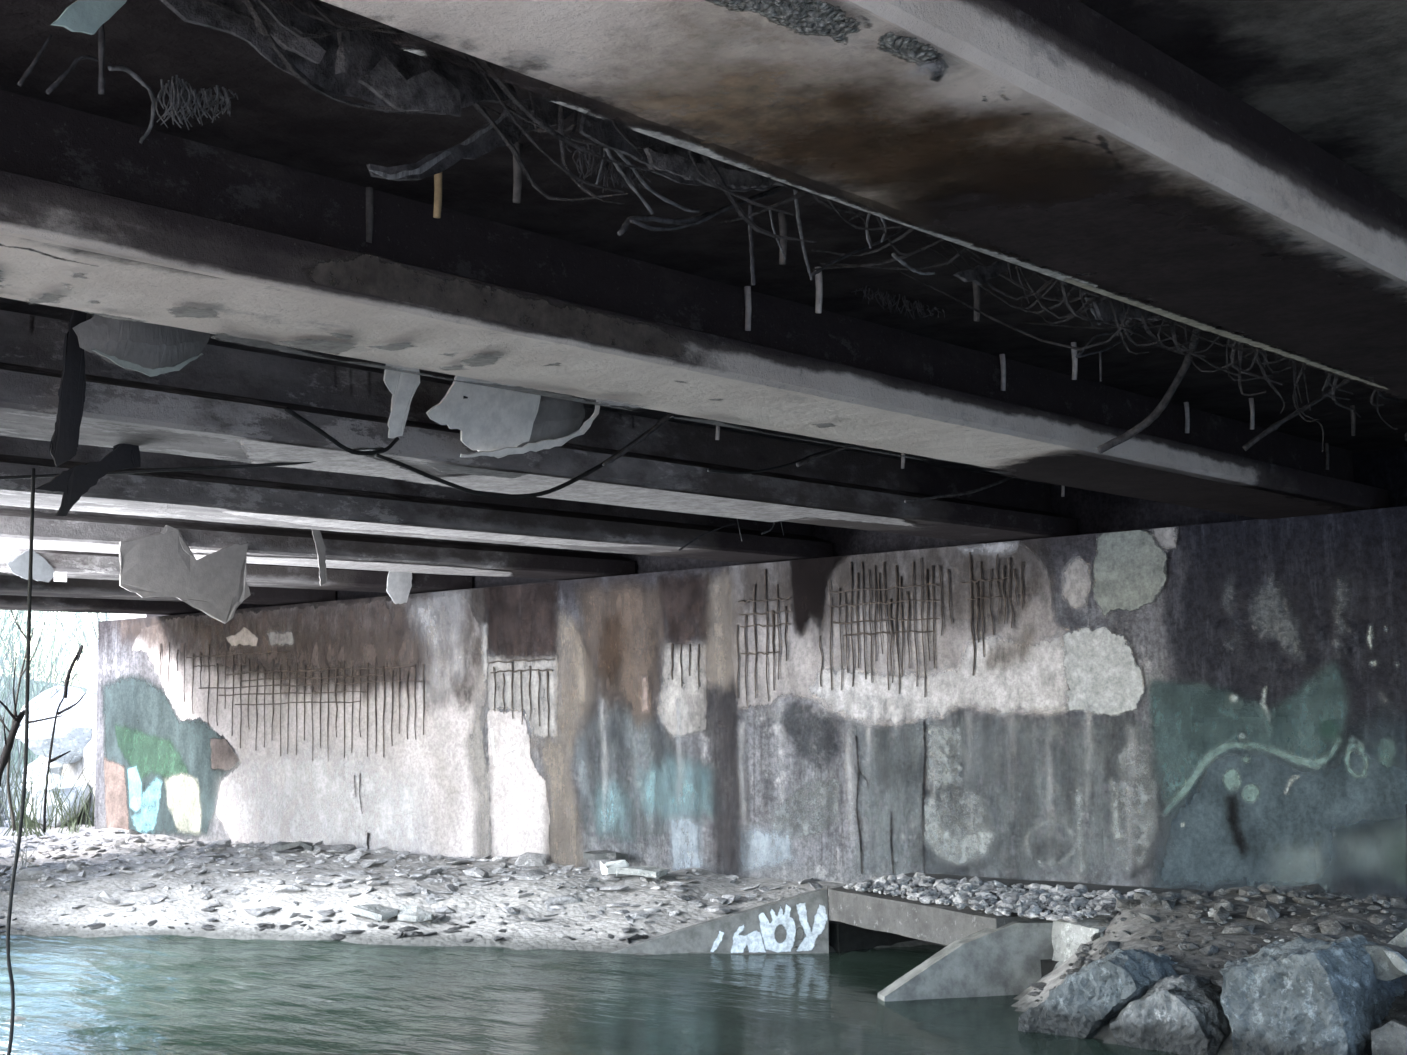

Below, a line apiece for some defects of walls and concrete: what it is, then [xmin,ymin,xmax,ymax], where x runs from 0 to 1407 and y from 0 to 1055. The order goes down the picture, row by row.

spalling [706,0,860,45]
spalling [877,32,949,82]
crack [0,244,95,266]
peeling [73,301,922,527]
spalling [730,527,1176,727]
water stain [706,685,748,875]